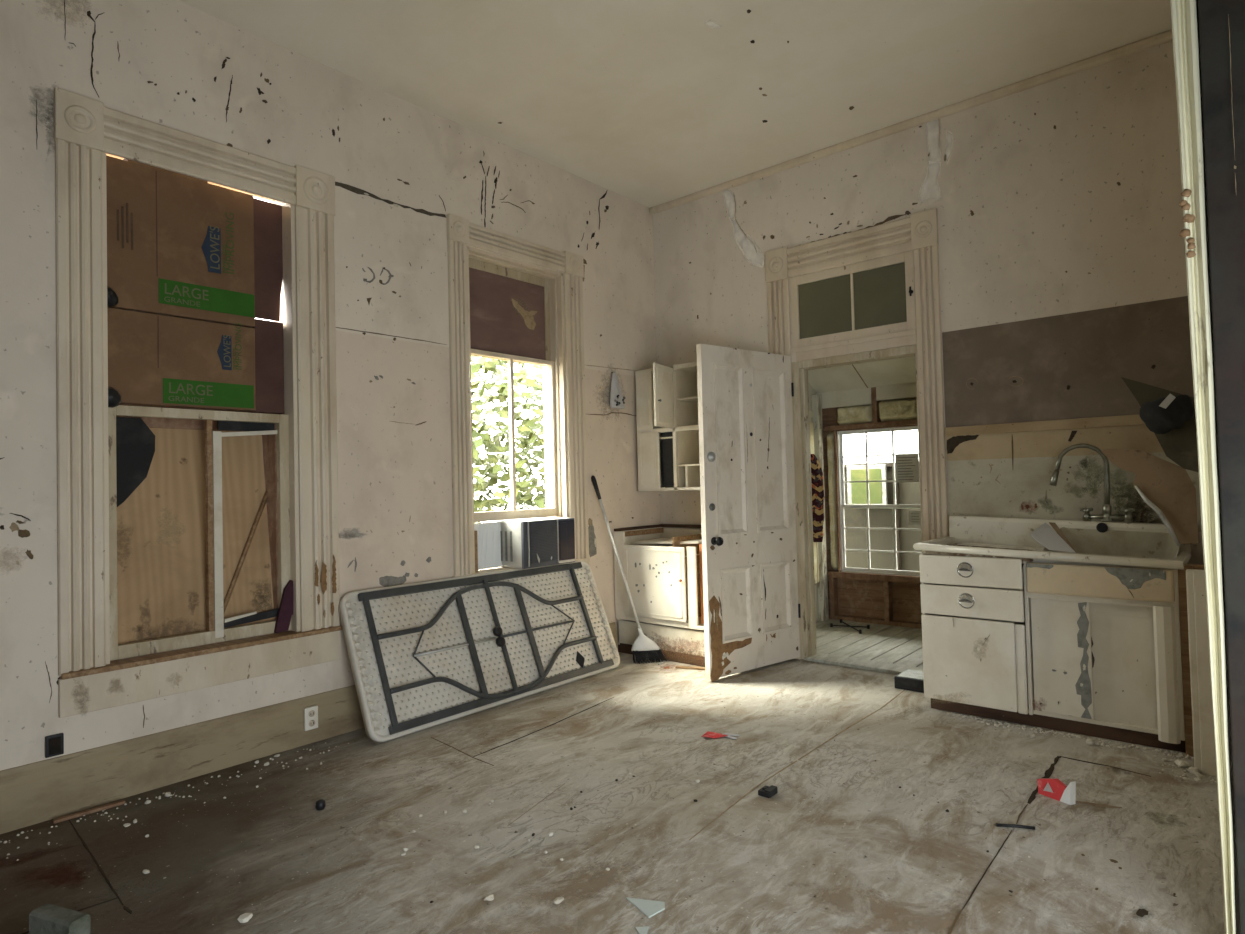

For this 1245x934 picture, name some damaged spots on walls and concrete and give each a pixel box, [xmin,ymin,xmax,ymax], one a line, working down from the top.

crack [87,11,120,97]
peeling [709,596,776,682]